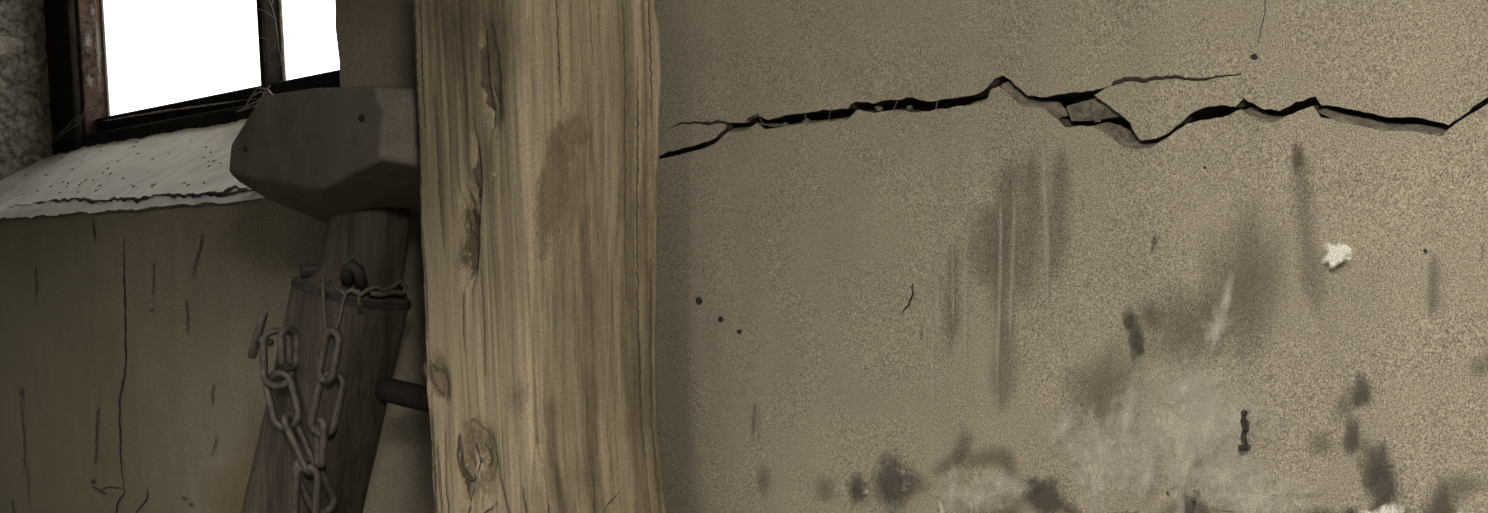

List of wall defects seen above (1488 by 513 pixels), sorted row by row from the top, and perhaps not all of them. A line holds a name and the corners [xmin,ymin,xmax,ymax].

crack [659,0,1488,159]
crack [11,185,254,208]
leakage [1173,267,1256,346]
crack [101,239,148,513]
leakage [939,376,1464,513]
flaking render [1347,505,1404,513]